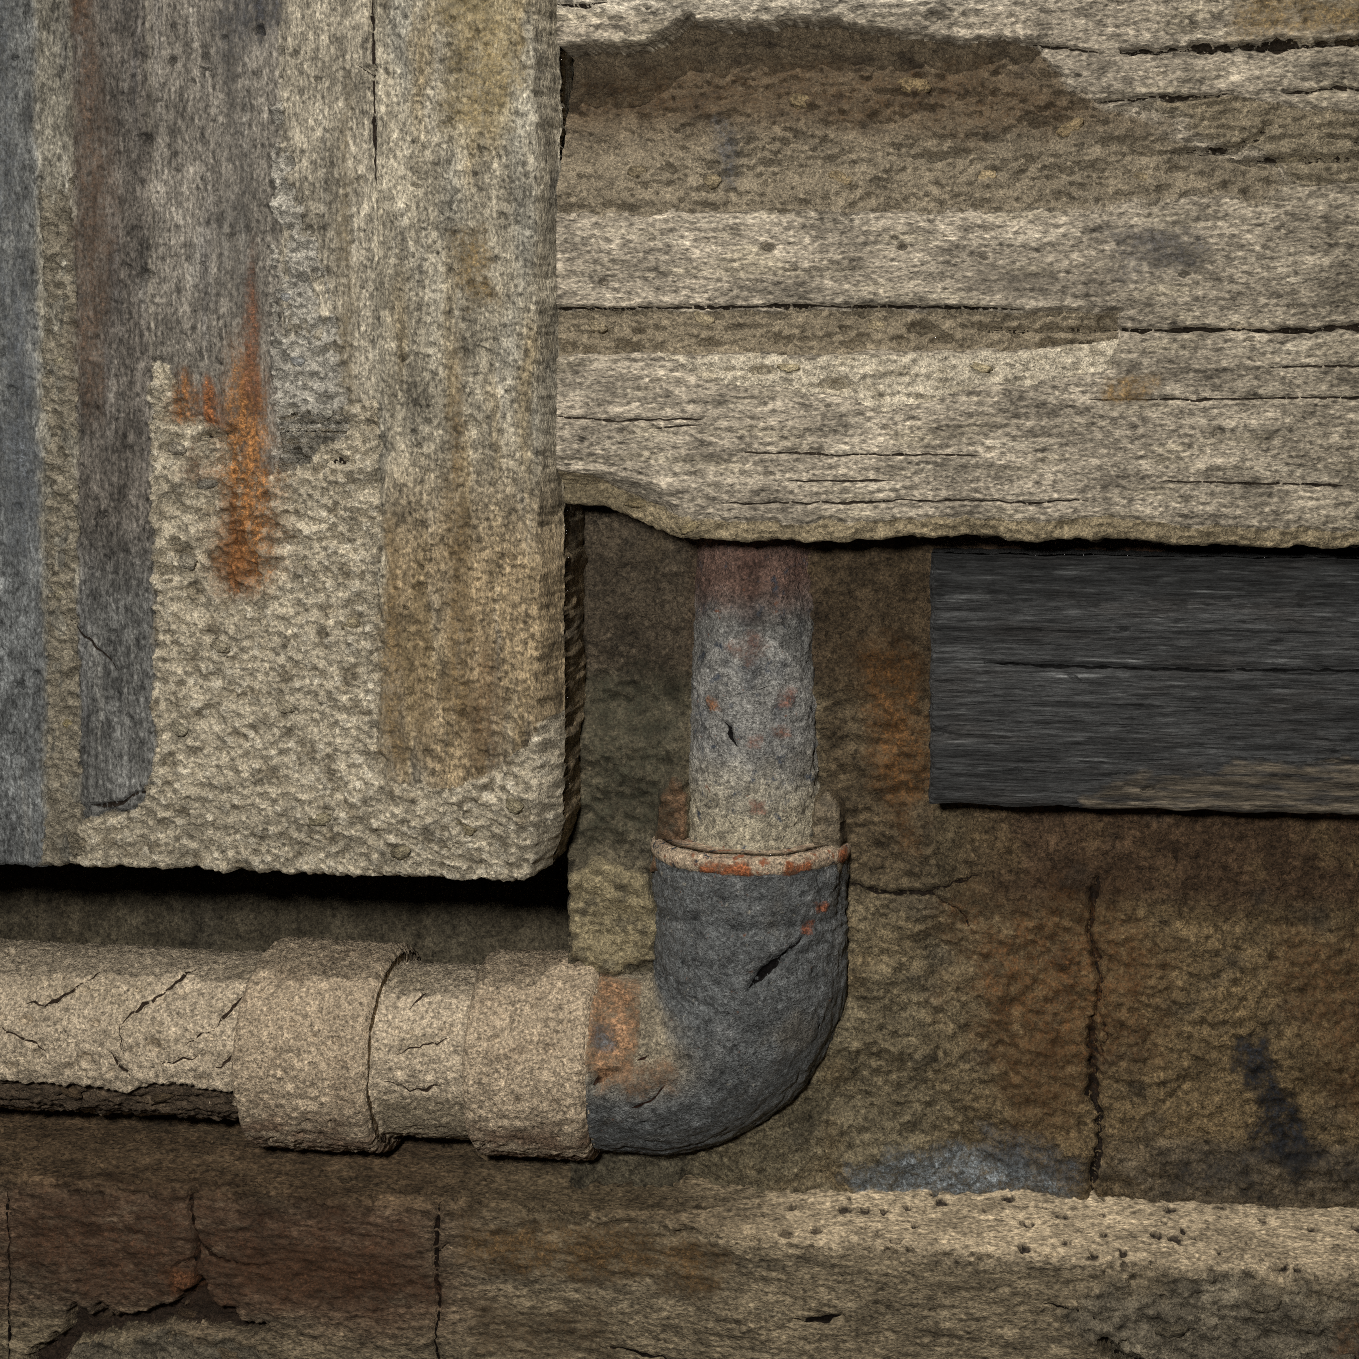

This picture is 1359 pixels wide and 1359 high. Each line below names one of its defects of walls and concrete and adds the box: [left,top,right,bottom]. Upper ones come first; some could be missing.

corrosion [173,271,275,591]
crack [1084,876,1109,1190]
crack [5,1191,13,1359]
crack [175,1192,259,1284]
crack [433,1201,447,1359]
crack [599,1345,667,1359]
crack [794,1314,842,1323]
crack [1045,1302,1141,1359]